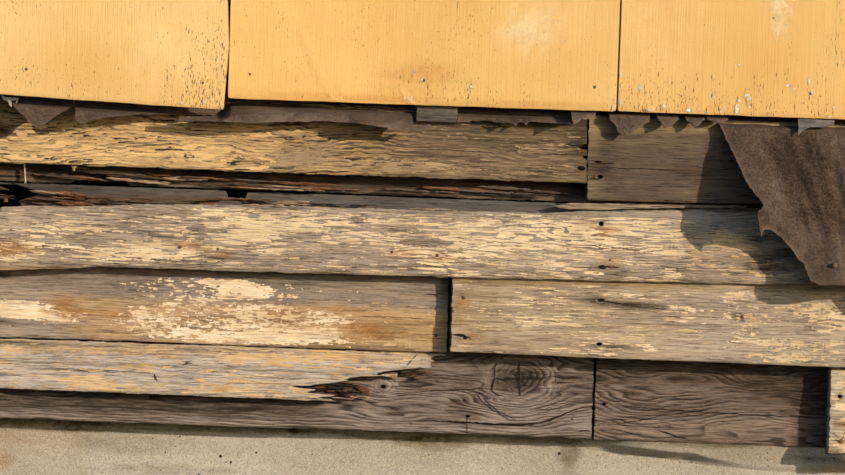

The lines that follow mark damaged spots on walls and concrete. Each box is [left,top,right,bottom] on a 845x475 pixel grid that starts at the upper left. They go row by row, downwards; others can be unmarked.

peeling [0,101,581,180]
peeling [0,206,845,453]